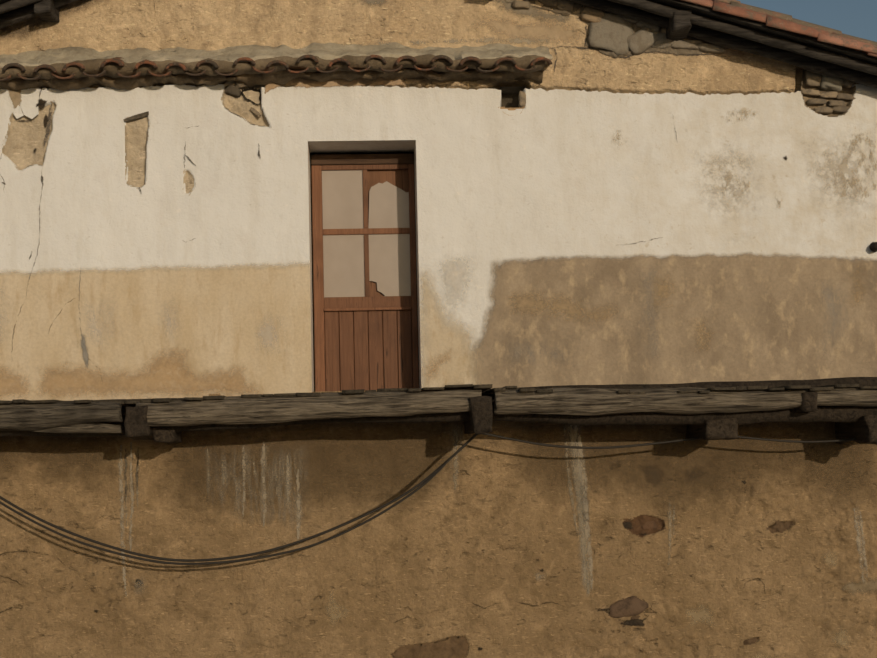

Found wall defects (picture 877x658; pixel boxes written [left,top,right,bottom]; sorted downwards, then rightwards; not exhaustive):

flaking render [512,0,728,58]
spalling [2,86,56,171]
spalling [123,111,149,192]
spalling [221,77,405,128]
spalling [183,170,196,195]
damp [0,264,312,401]
damp [179,429,442,539]
spalling [620,515,666,538]
damp [527,422,869,594]
spalling [766,520,795,536]
spalling [391,636,472,658]